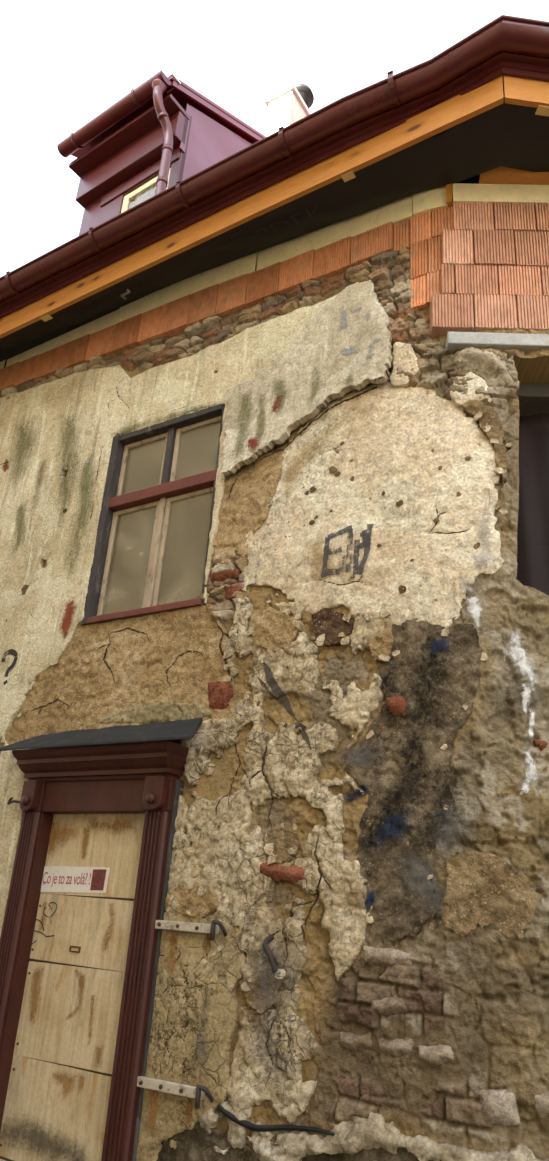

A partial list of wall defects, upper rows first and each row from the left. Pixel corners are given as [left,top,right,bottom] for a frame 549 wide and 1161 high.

leakage [16,506,25,546]
leakage [14,424,34,475]
leakage [60,421,96,568]
flaking render [211,449,284,564]
flaking render [0,593,237,754]
crack [97,627,149,685]
crack [166,616,285,841]
flaking render [247,607,543,943]
crack [272,830,333,966]
leakage [401,855,444,908]
crack [264,1001,291,1090]
flaking render [136,1123,260,1161]